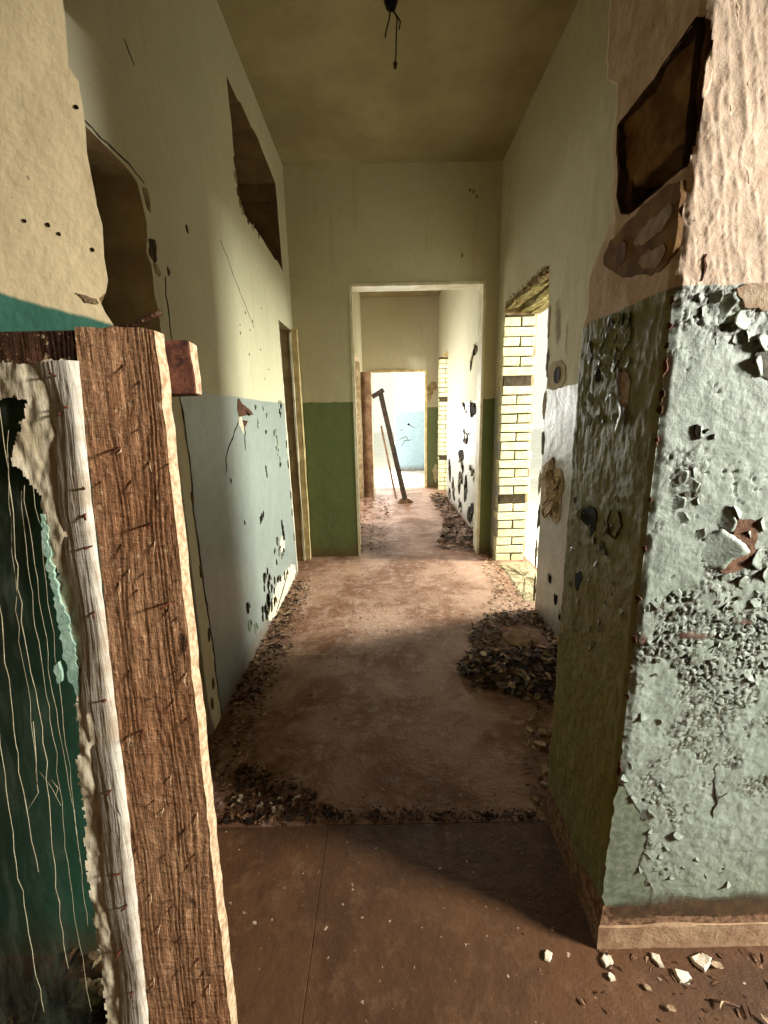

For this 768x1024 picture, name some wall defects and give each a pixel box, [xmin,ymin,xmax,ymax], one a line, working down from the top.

spalling [603,17,714,278]
spalling [171,397,222,731]
peeling [237,321,298,634]
flaking render [427,381,438,403]
peeling [432,401,477,532]
spalling [533,305,612,621]
peeling [583,312,632,435]
peeling [694,424,715,440]
peeling [670,466,768,589]
peeling [698,282,768,379]
peeling [602,760,684,907]
crack [712,763,728,819]